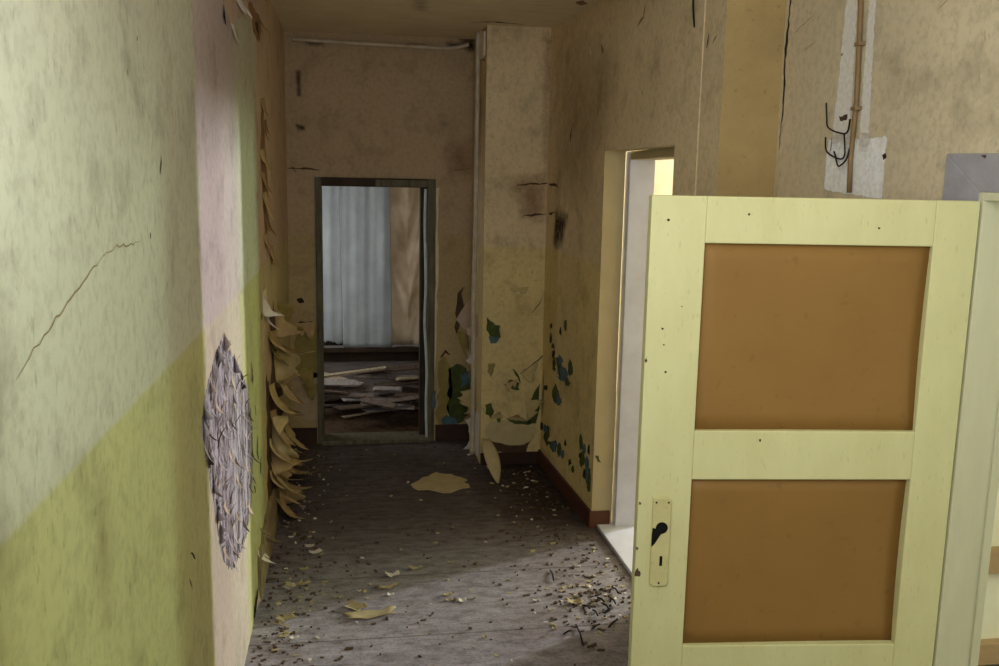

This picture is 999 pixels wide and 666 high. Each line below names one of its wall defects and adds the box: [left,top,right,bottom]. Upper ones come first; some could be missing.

peeling [222,0,267,44]
crack [16,241,140,380]
flaking render [201,288,318,619]
peeling [431,188,601,492]